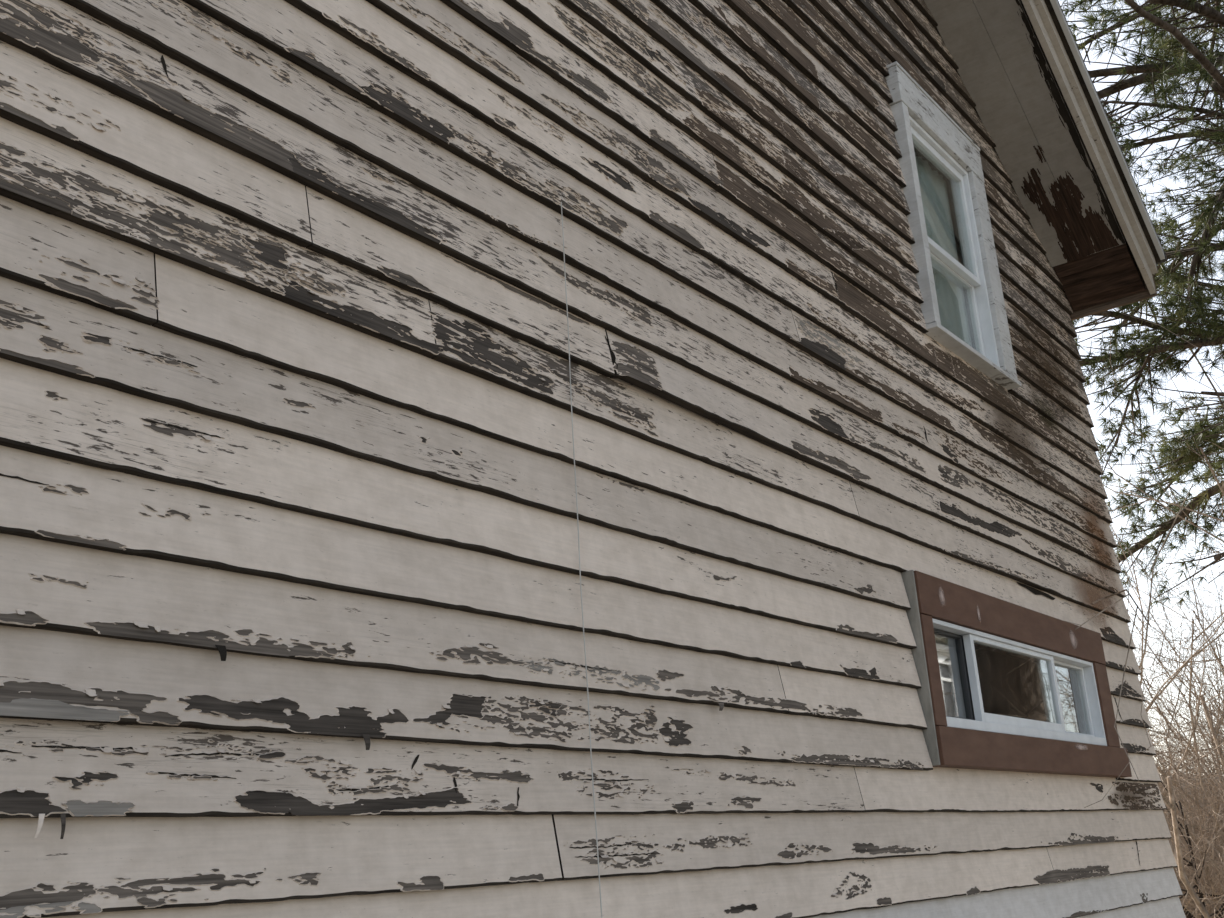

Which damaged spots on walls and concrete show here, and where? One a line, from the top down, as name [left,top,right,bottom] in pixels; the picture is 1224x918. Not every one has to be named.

peeling [0,0,628,326]
peeling [0,141,659,437]
peeling [485,0,1125,592]
peeling [139,417,225,444]
peeling [0,642,864,747]
peeling [0,739,533,817]
peeling [557,768,656,799]
peeling [0,867,321,918]
peeling [563,833,752,869]
peeling [830,871,892,906]
peeling [850,841,937,856]
peeling [1033,865,1110,885]